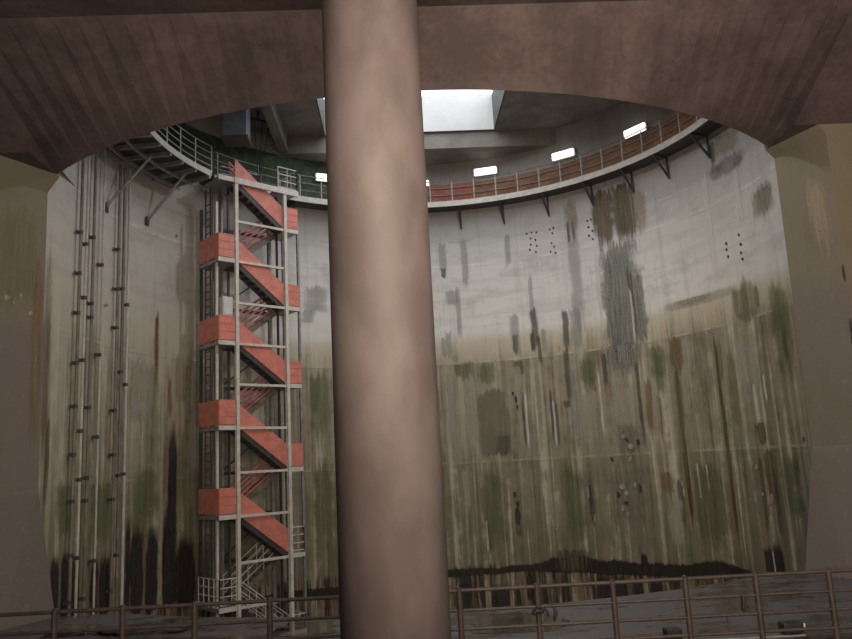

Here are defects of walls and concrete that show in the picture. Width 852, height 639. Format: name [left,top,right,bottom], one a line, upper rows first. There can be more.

leakage [567,203,576,242]
leakage [448,365,509,456]
leakage [513,335,530,444]
leakage [549,311,571,444]
leakage [581,182,647,444]
rust [671,337,693,521]
leakage [125,434,195,614]
leakage [448,549,752,609]